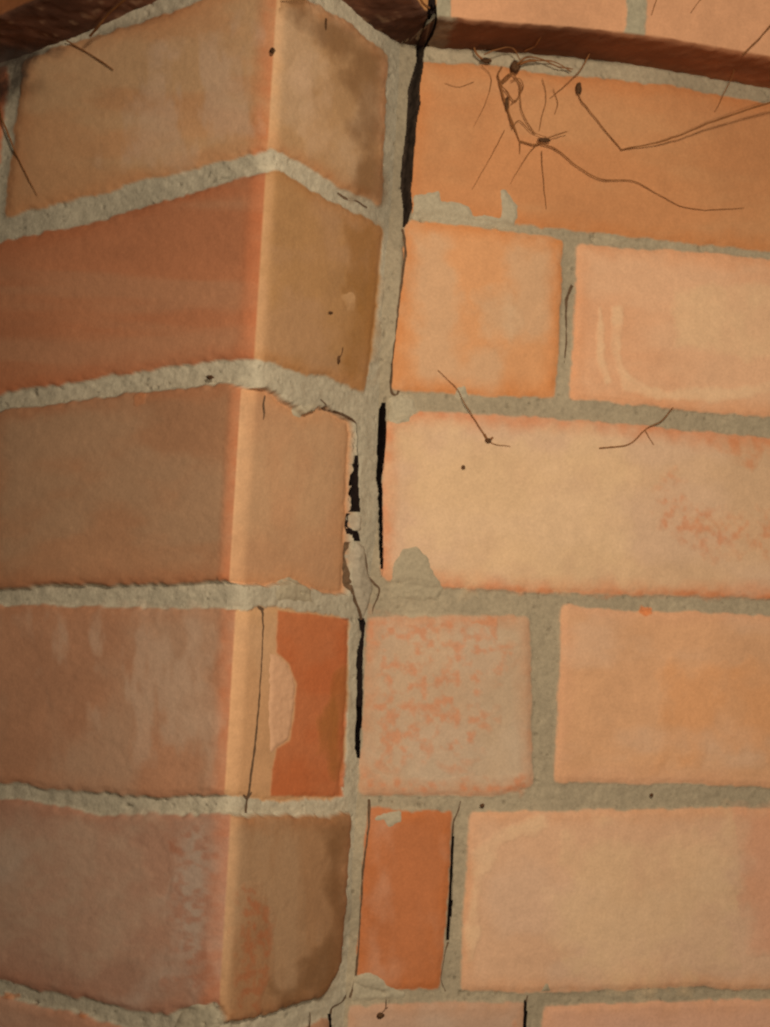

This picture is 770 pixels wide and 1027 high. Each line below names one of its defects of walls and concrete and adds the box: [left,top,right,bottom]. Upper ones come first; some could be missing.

crack [320,0,437,759]
crack [243,606,264,813]
peeling [268,609,353,798]
crack [328,799,371,1027]
crack [441,801,461,991]
crack [521,996,529,1027]